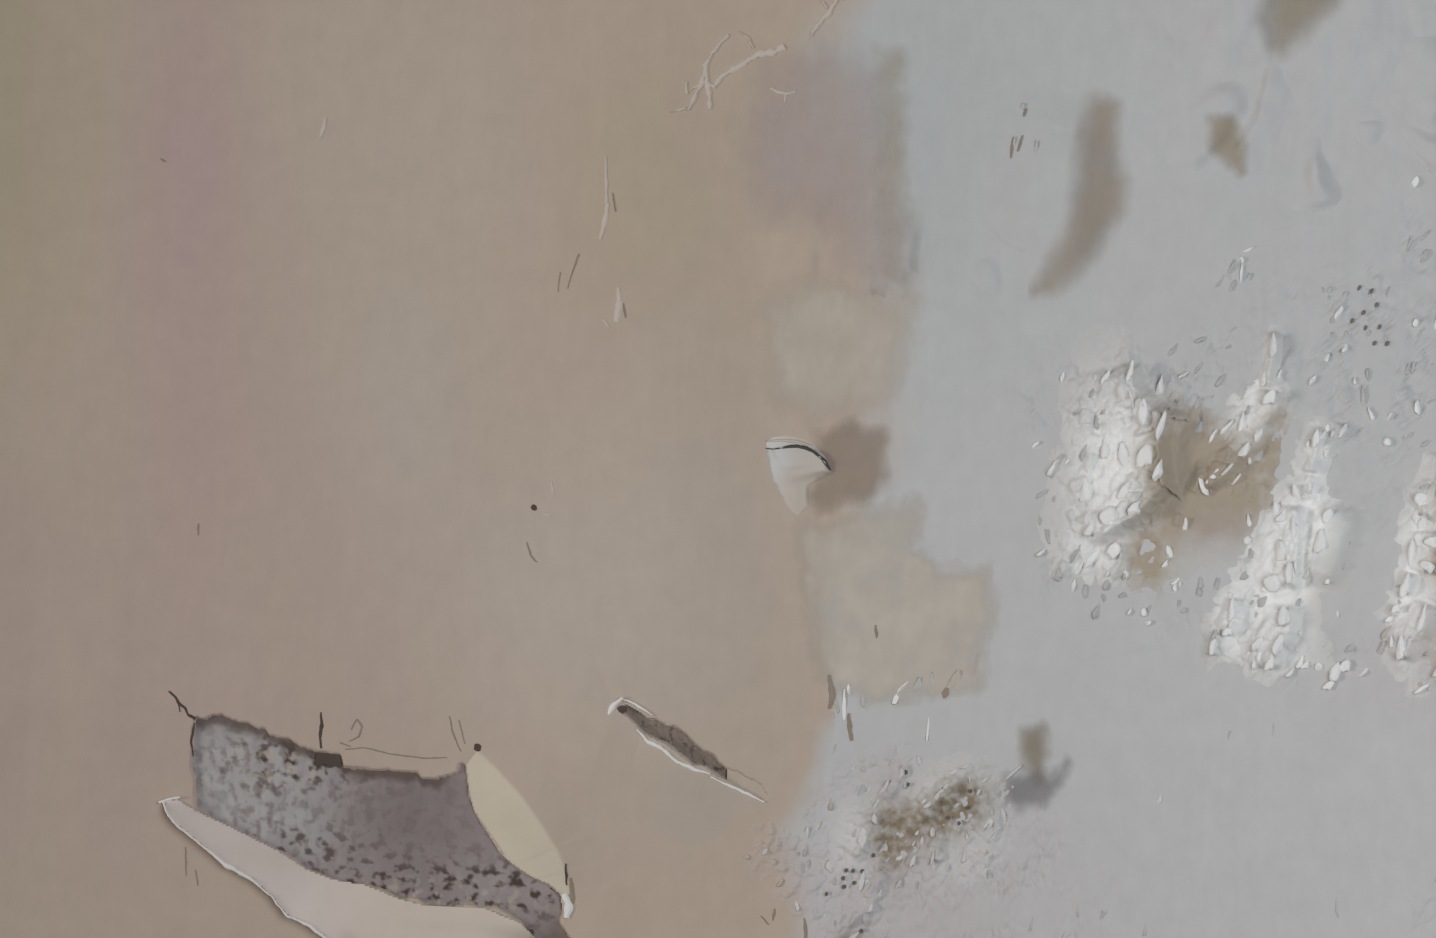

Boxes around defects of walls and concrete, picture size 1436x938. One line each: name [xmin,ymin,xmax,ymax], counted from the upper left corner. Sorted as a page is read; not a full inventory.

flaking render [1309,285,1390,386]
water stain [803,511,987,699]
flaking render [1032,323,1436,700]
peeling [158,632,1022,938]